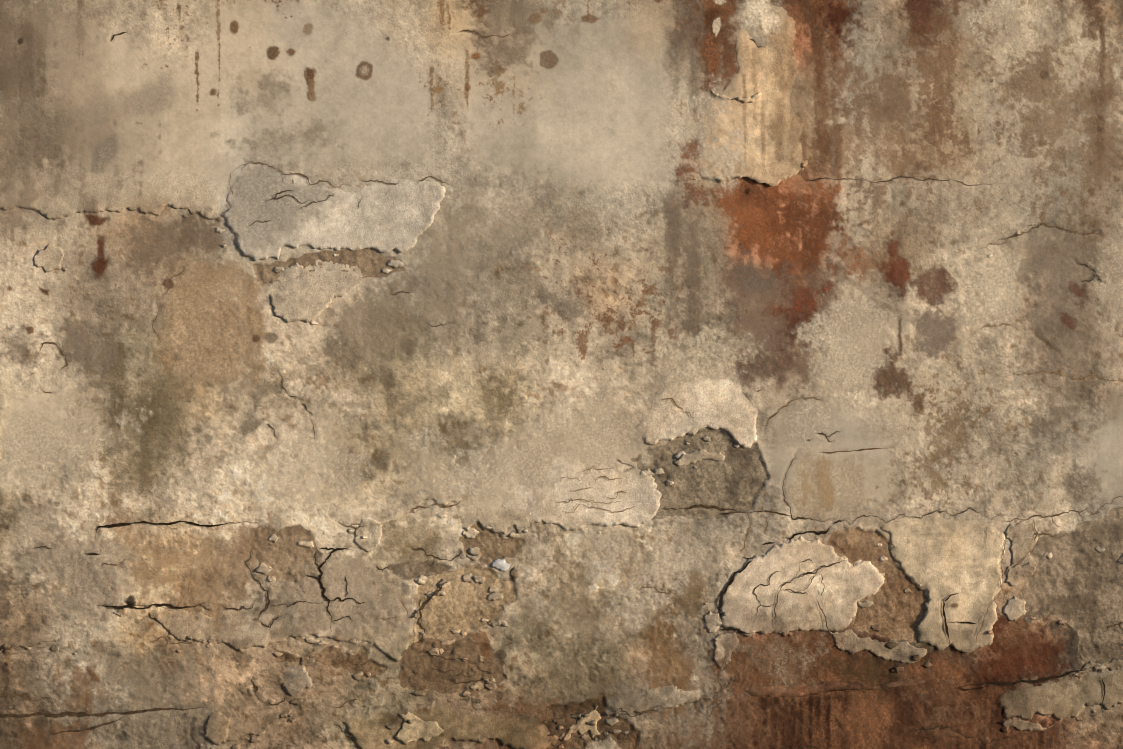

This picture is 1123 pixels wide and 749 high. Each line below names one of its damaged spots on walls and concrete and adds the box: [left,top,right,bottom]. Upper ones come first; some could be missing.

rust [155,0,264,111]
peeling [0,163,446,325]
rust [545,250,698,371]
peeling [693,3,808,187]
rust [676,0,1123,344]
crack [983,223,1098,248]
water stain [0,322,153,484]
crack [85,521,496,687]
crack [411,502,460,522]
peeling [104,375,771,749]
rust [641,572,1080,749]
peeling [704,507,1123,732]